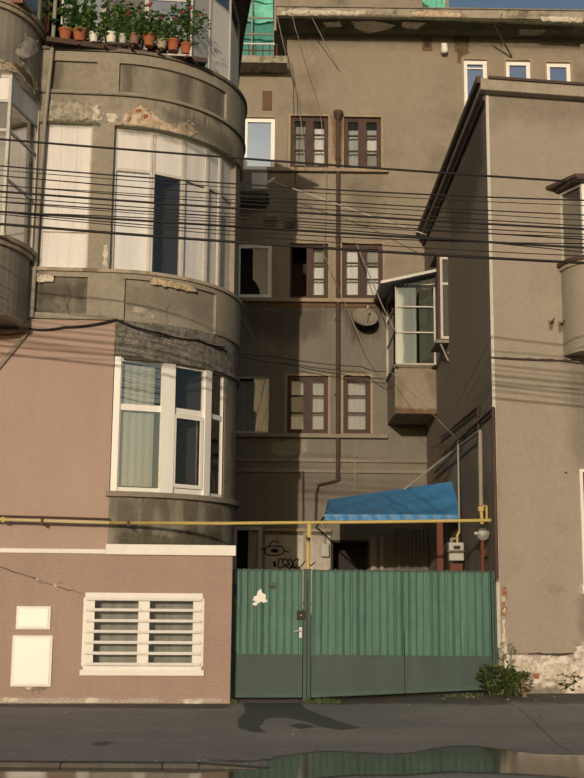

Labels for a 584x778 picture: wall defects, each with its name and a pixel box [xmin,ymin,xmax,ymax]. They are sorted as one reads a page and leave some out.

spalling [278,9,462,33]
spalling [519,16,583,35]
spalling [0,33,39,94]
spalling [102,105,197,137]
peeling [148,276,197,292]
crack [0,566,79,593]
peeling [500,585,584,694]